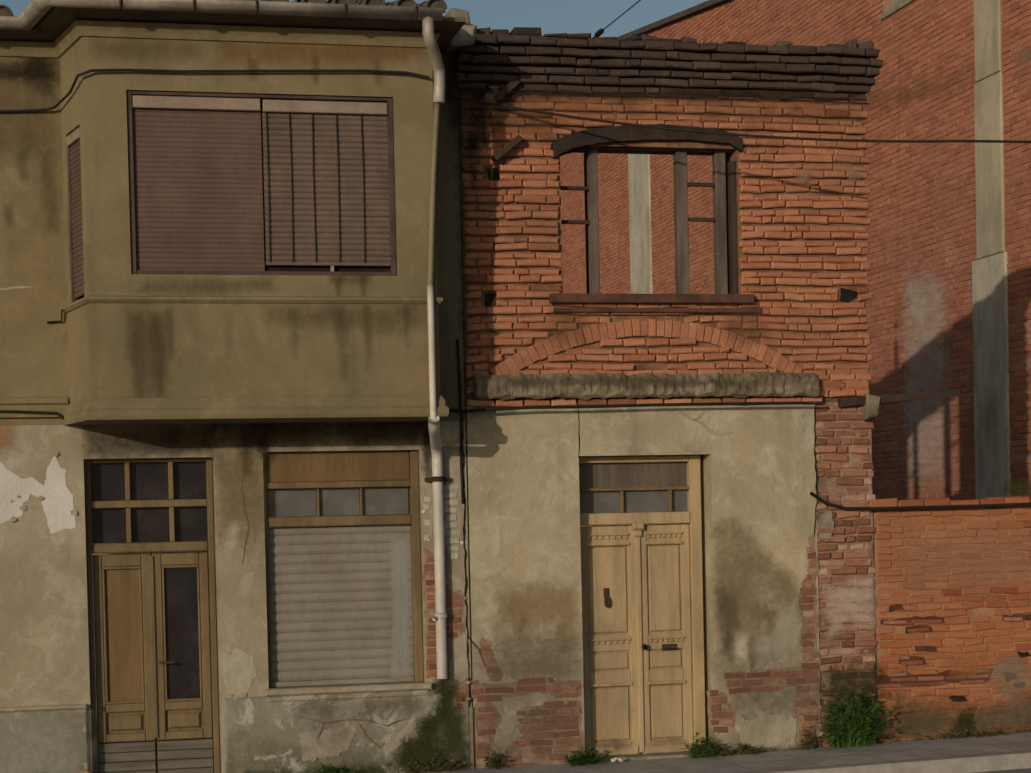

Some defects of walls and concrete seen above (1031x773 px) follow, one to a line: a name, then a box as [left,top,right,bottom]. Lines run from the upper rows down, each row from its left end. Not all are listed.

peeling [0,451,77,534]
crack [241,475,249,563]
spalling [421,479,467,678]
peeling [299,726,354,762]
peeling [382,703,426,758]
spalling [454,638,585,768]
spalling [706,529,945,748]
spalling [875,646,993,689]